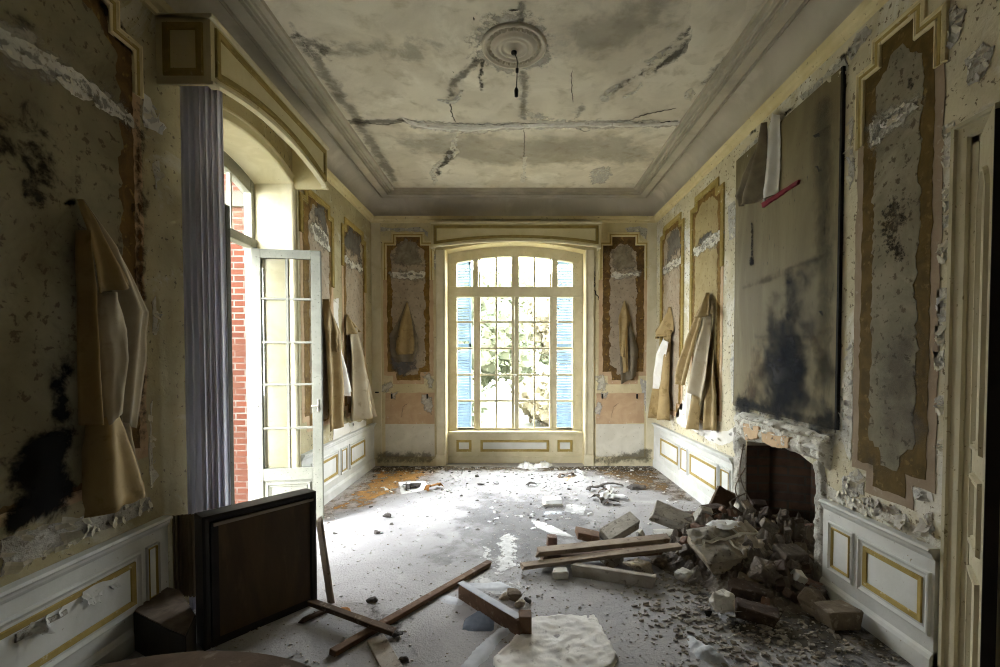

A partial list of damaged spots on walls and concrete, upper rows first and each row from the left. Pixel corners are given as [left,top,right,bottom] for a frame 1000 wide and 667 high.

mould [0,102,57,209]
flaking render [0,21,166,135]
flaking render [429,131,460,185]
crack [401,71,680,178]
flaking render [869,96,919,148]
peeling [964,42,995,86]
mould [878,195,911,262]
peeling [933,288,947,372]
mould [2,357,76,535]
peeling [0,400,159,577]
peeling [826,340,941,548]
peeling [14,605,68,643]